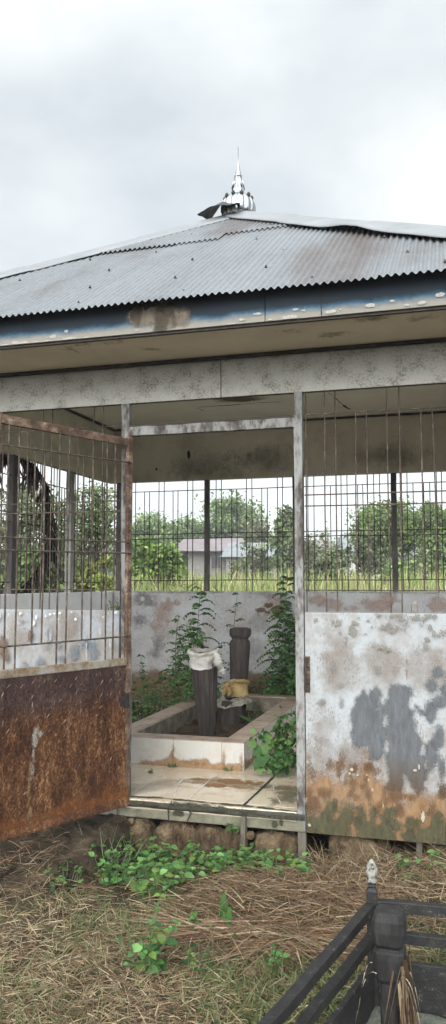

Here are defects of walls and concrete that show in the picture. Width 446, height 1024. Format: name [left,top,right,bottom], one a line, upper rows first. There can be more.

water stain [128,301,189,331]